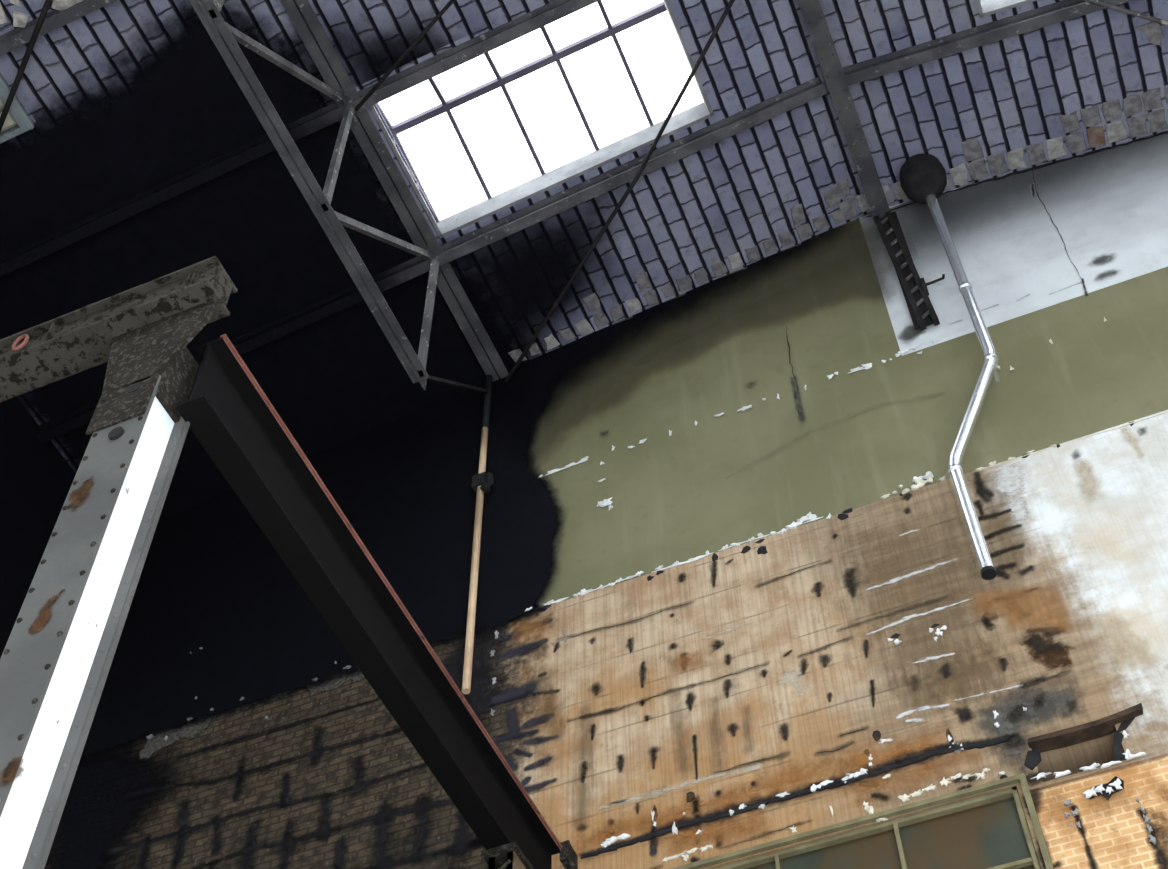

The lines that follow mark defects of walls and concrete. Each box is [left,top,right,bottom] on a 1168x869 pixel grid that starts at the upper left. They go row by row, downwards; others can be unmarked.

spalling [0,0,30,28]
crack [866,131,1168,296]
rust [67,479,93,509]
peeling [881,471,946,499]
peeling [525,508,853,611]
rust [28,592,61,634]
water stain [910,653,954,691]
water stain [896,685,1022,722]
rust [1,757,24,785]
spalling [580,710,1015,862]
spalling [1024,717,1146,869]
spalling [1136,797,1168,869]